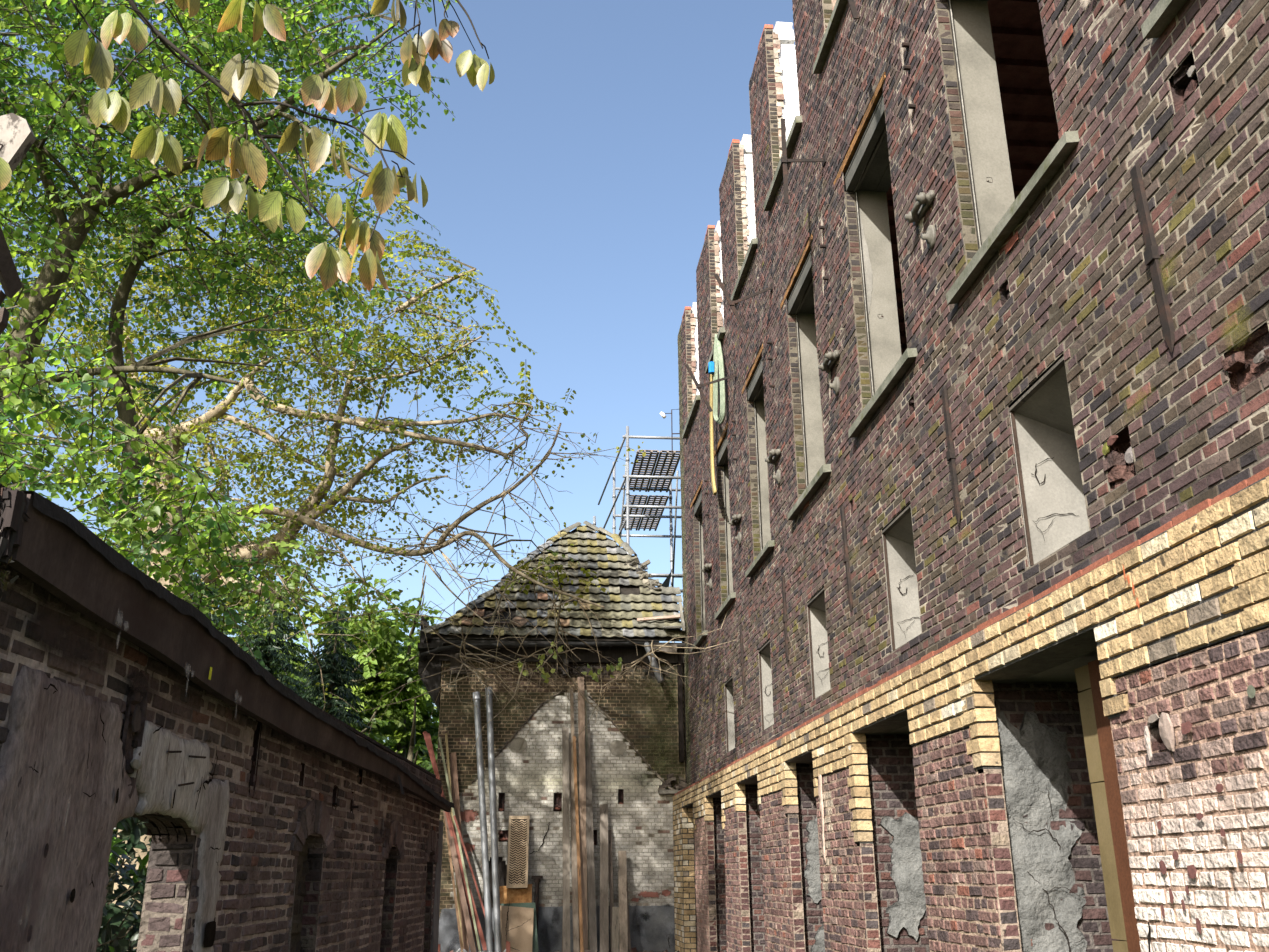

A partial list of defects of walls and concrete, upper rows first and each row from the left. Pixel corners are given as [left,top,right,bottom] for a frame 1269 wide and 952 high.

spalling [1164,52,1201,115]
spalling [1221,323,1269,398]
crack [1031,457,1054,484]
spalling [1101,426,1140,492]
crack [1033,513,1079,541]
flaking render [116,671,148,803]
spalling [1144,712,1193,761]
peeling [1159,850,1201,935]